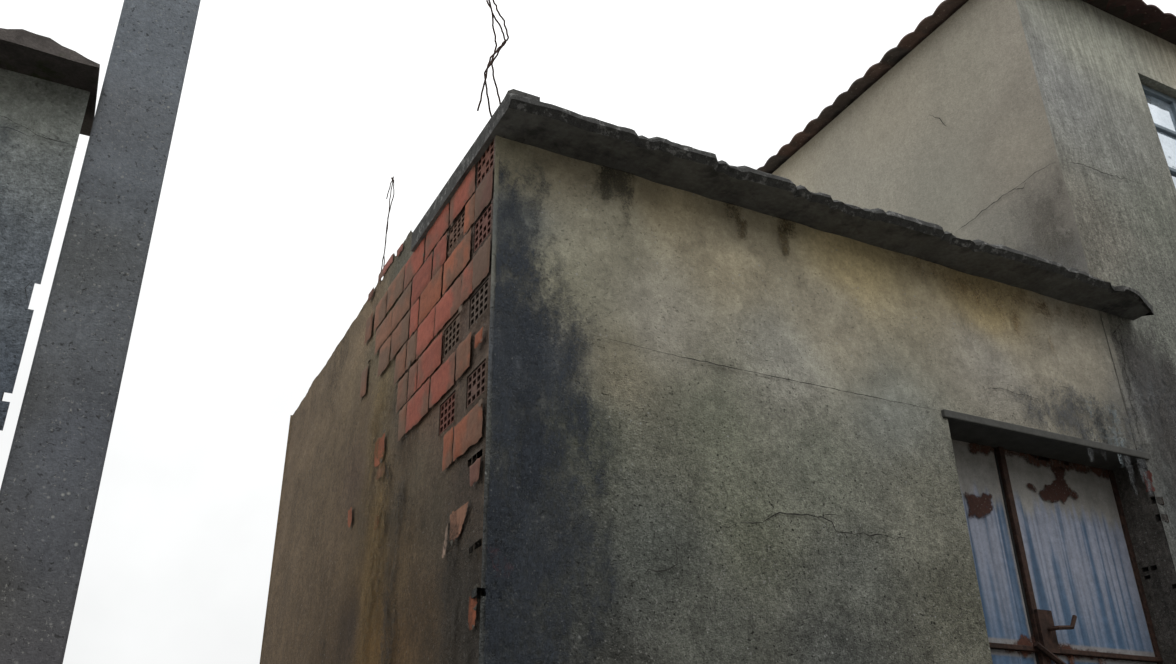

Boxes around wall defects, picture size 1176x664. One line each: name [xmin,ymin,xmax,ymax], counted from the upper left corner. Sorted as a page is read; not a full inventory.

crack [961,162,1141,228]
flaking render [360,164,493,486]
water stain [440,162,616,664]
rust [969,443,1111,504]
flaking render [442,502,468,558]
crack [716,512,916,541]
rust [965,492,993,518]
rust [1006,634,1119,664]